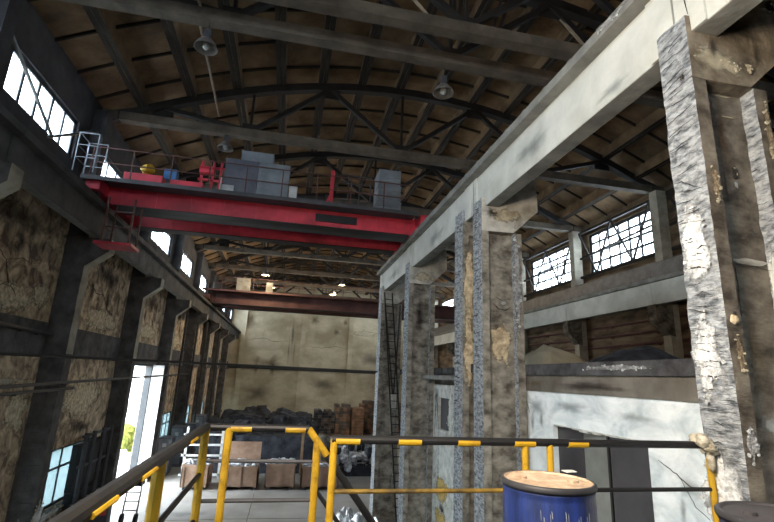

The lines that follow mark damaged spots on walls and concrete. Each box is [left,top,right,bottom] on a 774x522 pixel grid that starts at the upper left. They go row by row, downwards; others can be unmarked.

peeling [720,59,753,74]
peeling [490,231,523,368]
crack [659,32,726,444]
crack [658,460,710,520]